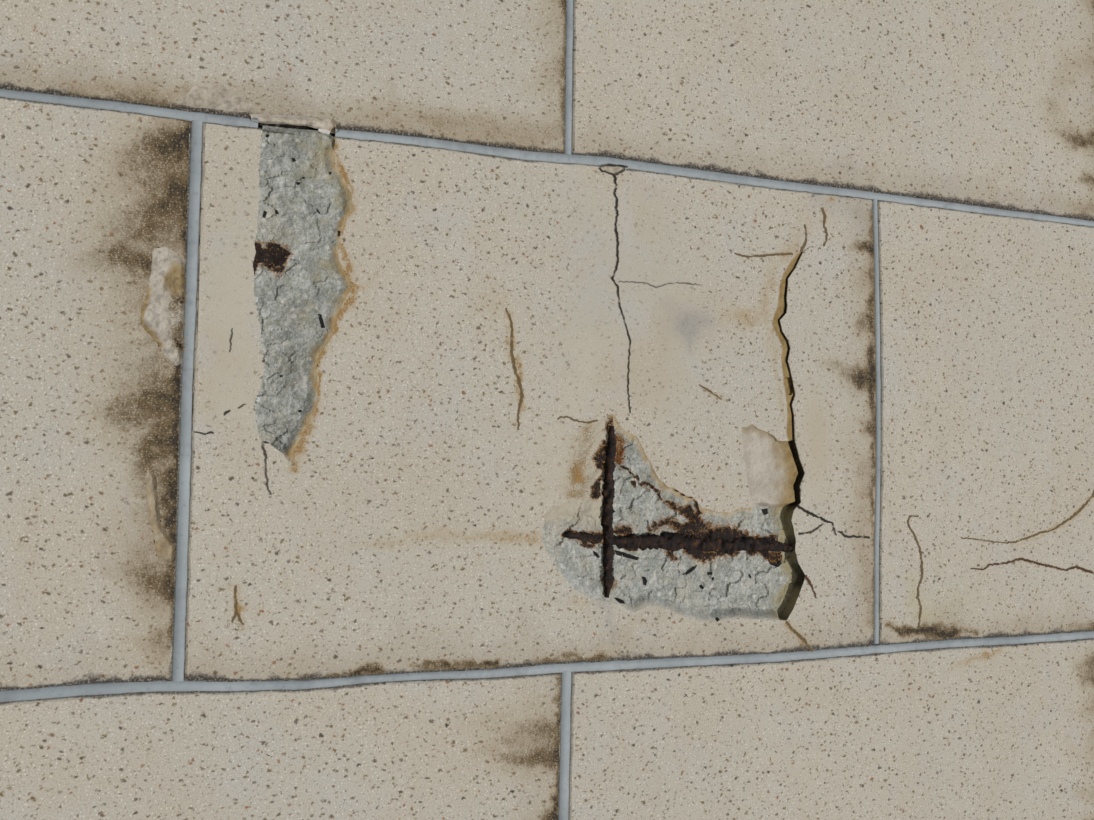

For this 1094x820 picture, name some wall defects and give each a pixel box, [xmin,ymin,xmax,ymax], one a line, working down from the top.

damp [39,65,199,679]
spalling [140,247,187,366]
spalling [178,83,382,481]
crack [459,269,531,436]
crack [599,163,631,414]
crack [729,207,828,441]
spalling [145,470,177,563]
spalling [542,414,805,622]
crack [781,612,820,652]
crack [908,515,924,628]
crack [961,484,1094,574]
damp [1034,640,1094,820]